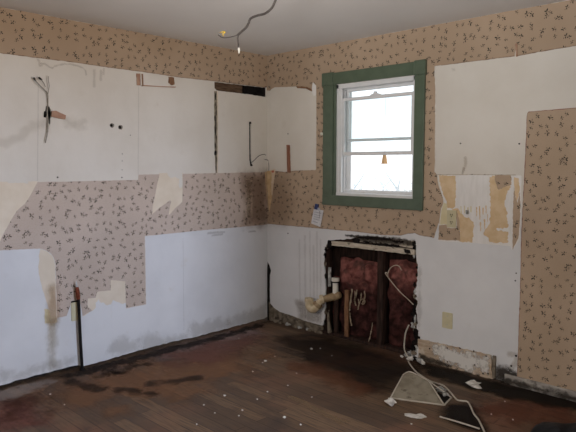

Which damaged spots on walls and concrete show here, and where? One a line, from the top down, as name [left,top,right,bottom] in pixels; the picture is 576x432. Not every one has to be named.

peeling [0,180,38,241]
peeling [152,171,183,215]
water stain [345,235,412,246]
peeling [437,174,522,250]
peeling [38,249,57,324]
peeling [83,280,126,316]
flaking render [269,266,327,334]
flaking render [353,236,425,365]
water stain [493,365,576,401]